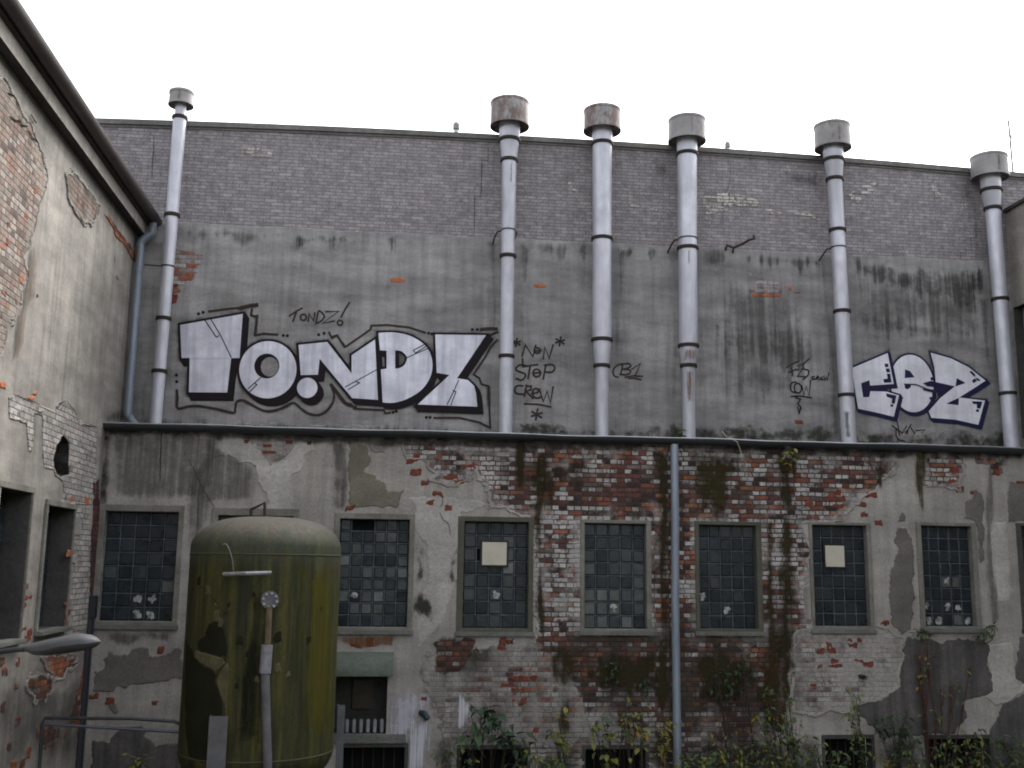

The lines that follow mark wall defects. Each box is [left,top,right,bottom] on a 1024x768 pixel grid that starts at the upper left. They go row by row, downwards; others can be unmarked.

flaking render [0,75,49,359]
flaking render [64,170,136,262]
flaking render [171,247,203,304]
damp [857,261,982,306]
flaking render [0,381,107,634]
peeling [215,422,408,509]
flaking render [401,422,907,768]
flaking render [0,652,115,768]
peeling [984,642,1024,706]